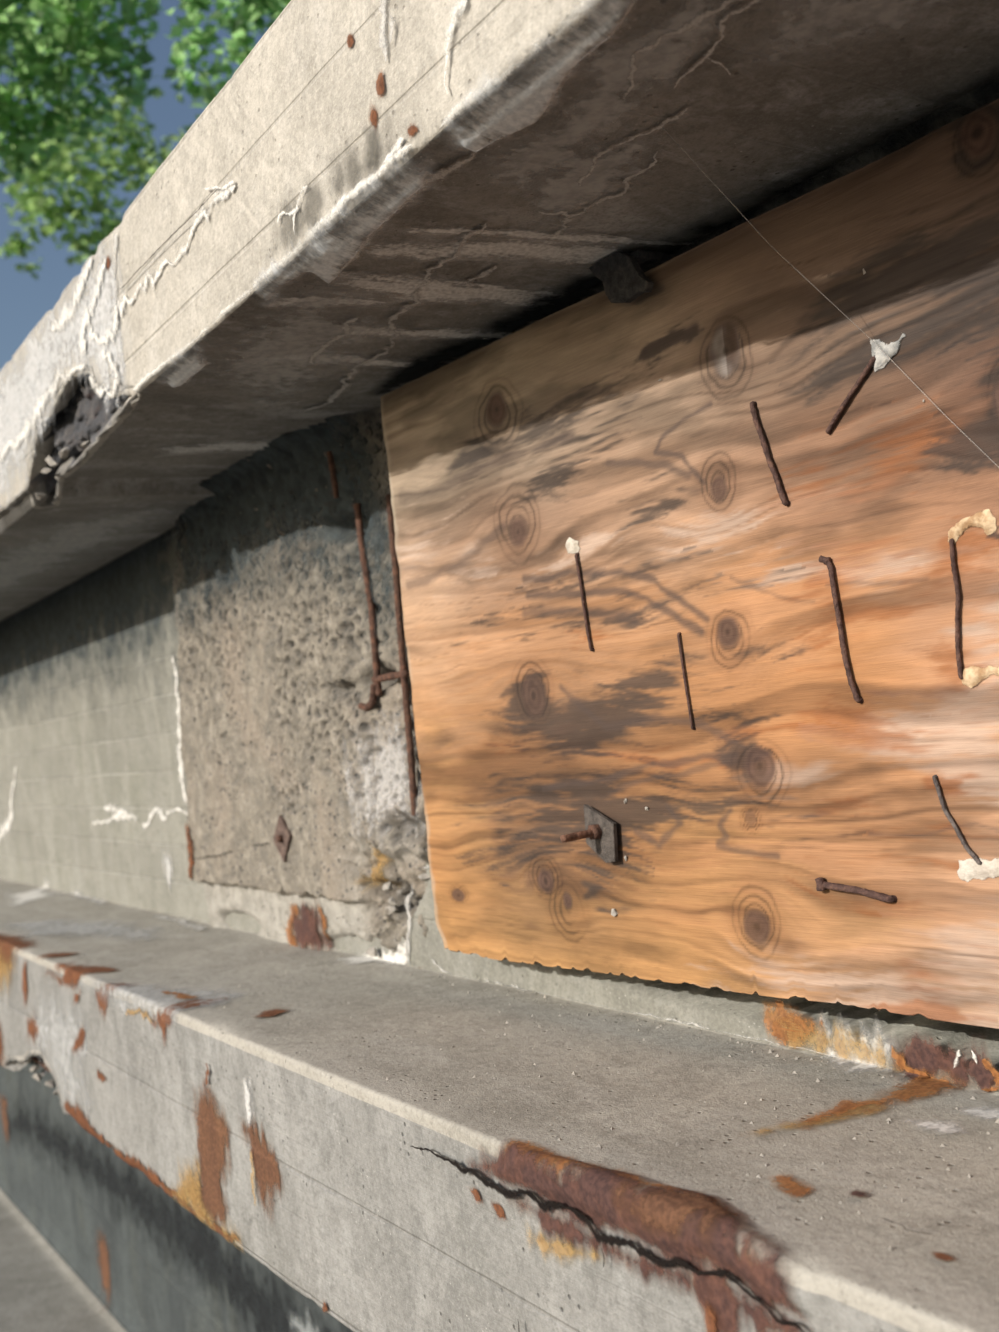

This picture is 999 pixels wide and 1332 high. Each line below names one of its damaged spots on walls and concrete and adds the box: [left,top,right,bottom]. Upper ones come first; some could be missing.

crack [113,180,235,316]
crack [277,185,308,235]
spalling [24,365,141,509]
leakage [0,414,392,697]
crack [92,655,187,829]
spalling [173,407,430,957]
rust [353,494,418,816]
leakage [9,1109,330,1332]
rust [64,1063,280,1243]
crack [411,1146,804,1332]
rust [471,1139,802,1332]
rust [758,1000,999,1133]